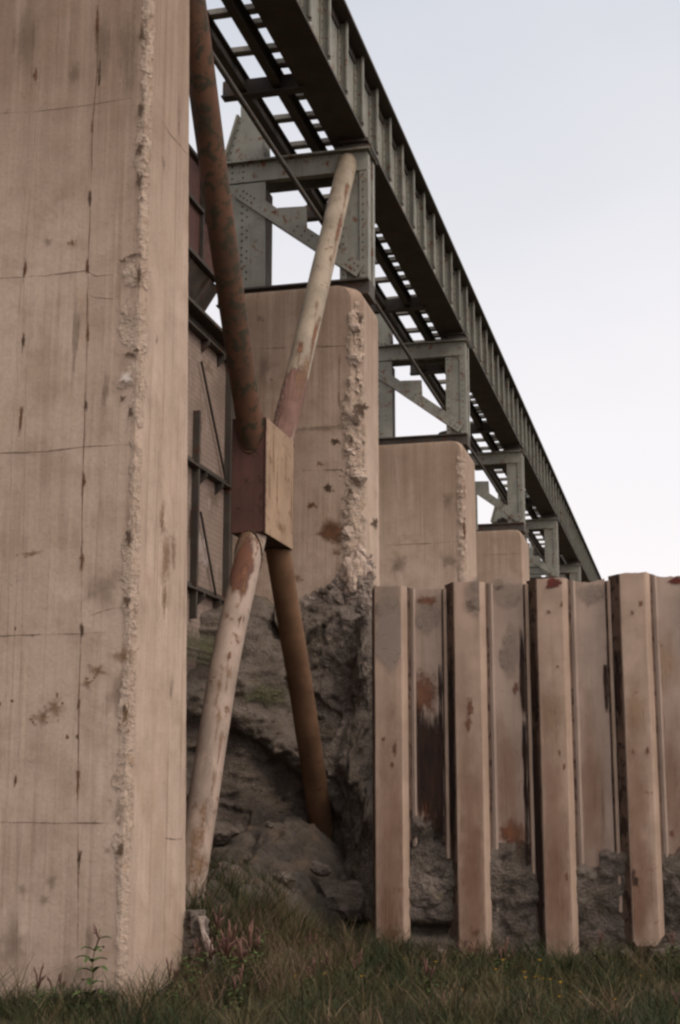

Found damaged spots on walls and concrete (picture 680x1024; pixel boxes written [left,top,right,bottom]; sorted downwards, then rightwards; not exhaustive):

crack [38,30,122,172]
crack [12,202,109,363]
crack [2,389,113,545]
spalling [108,0,155,1003]
rust [319,521,343,553]
spalling [299,300,378,618]
crack [17,633,100,824]